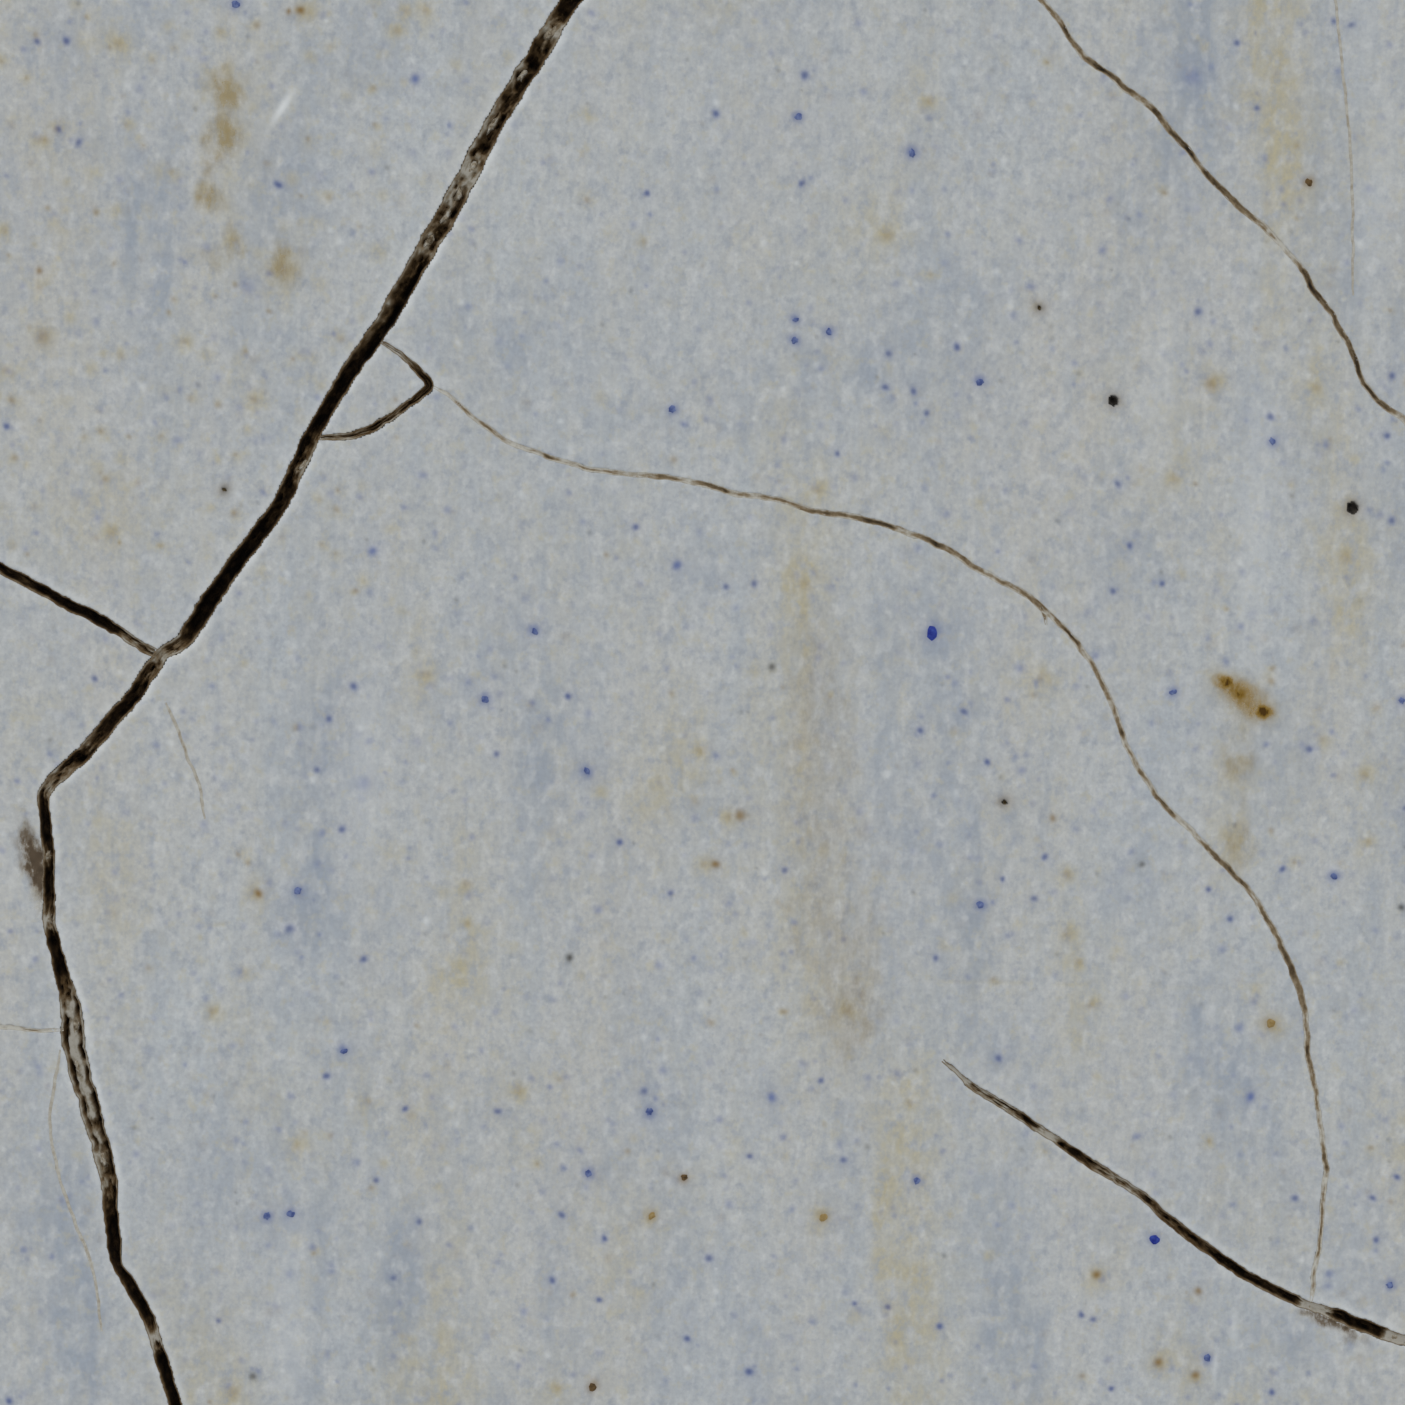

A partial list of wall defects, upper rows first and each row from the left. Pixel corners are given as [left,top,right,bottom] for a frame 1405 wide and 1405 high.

crack [1038,0,1405,425]
crack [0,0,583,1405]
crack [433,386,1405,1346]
corrosion [1217,676,1273,720]